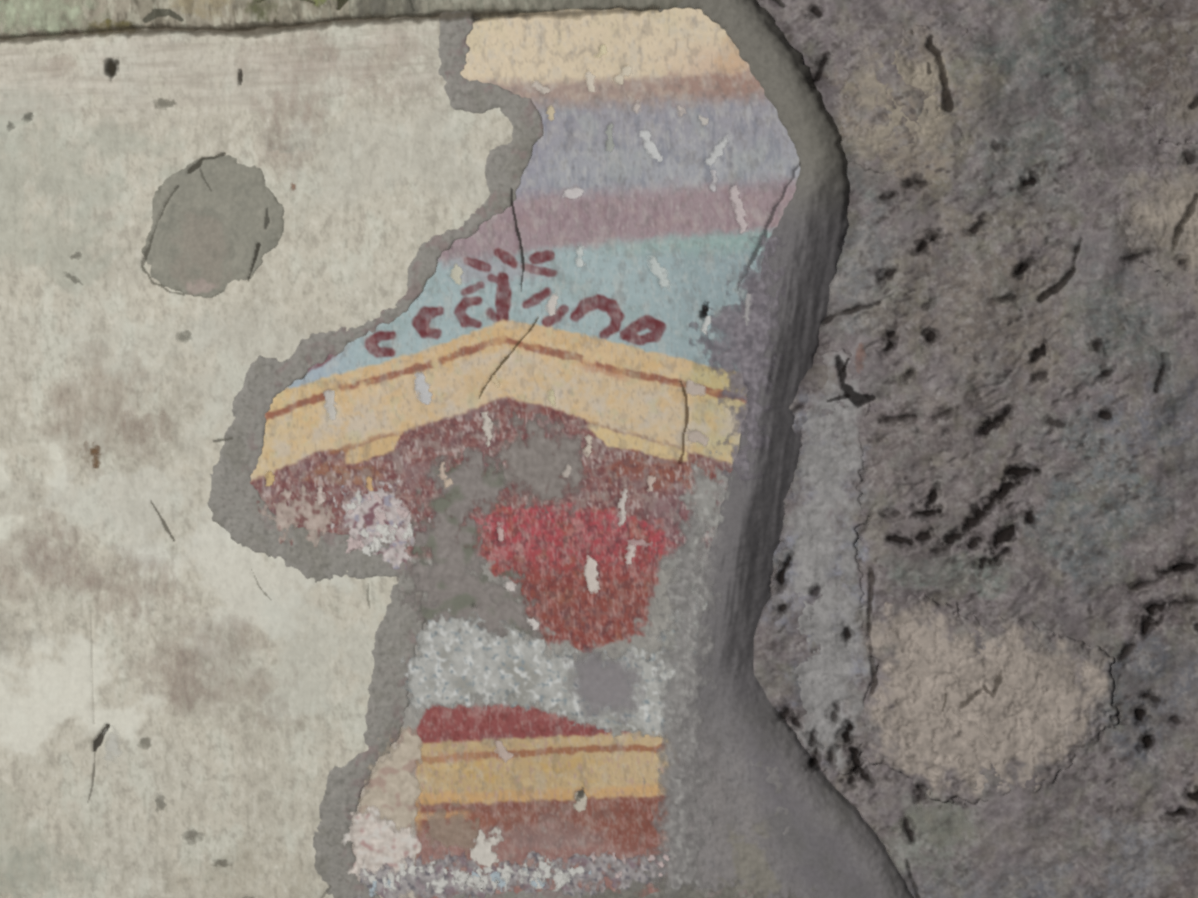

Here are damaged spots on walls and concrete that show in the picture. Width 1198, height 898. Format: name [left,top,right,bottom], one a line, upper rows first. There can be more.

peeling [639,130,663,162]
peeling [564,187,584,199]
peeling [705,135,748,233]
crack [511,189,524,287]
peeling [648,256,669,287]
peeling [546,294,559,316]
crack [480,318,538,396]
peeling [324,390,337,420]
peeling [414,373,432,405]
spalling [257,412,729,737]
spalling [343,726,670,898]